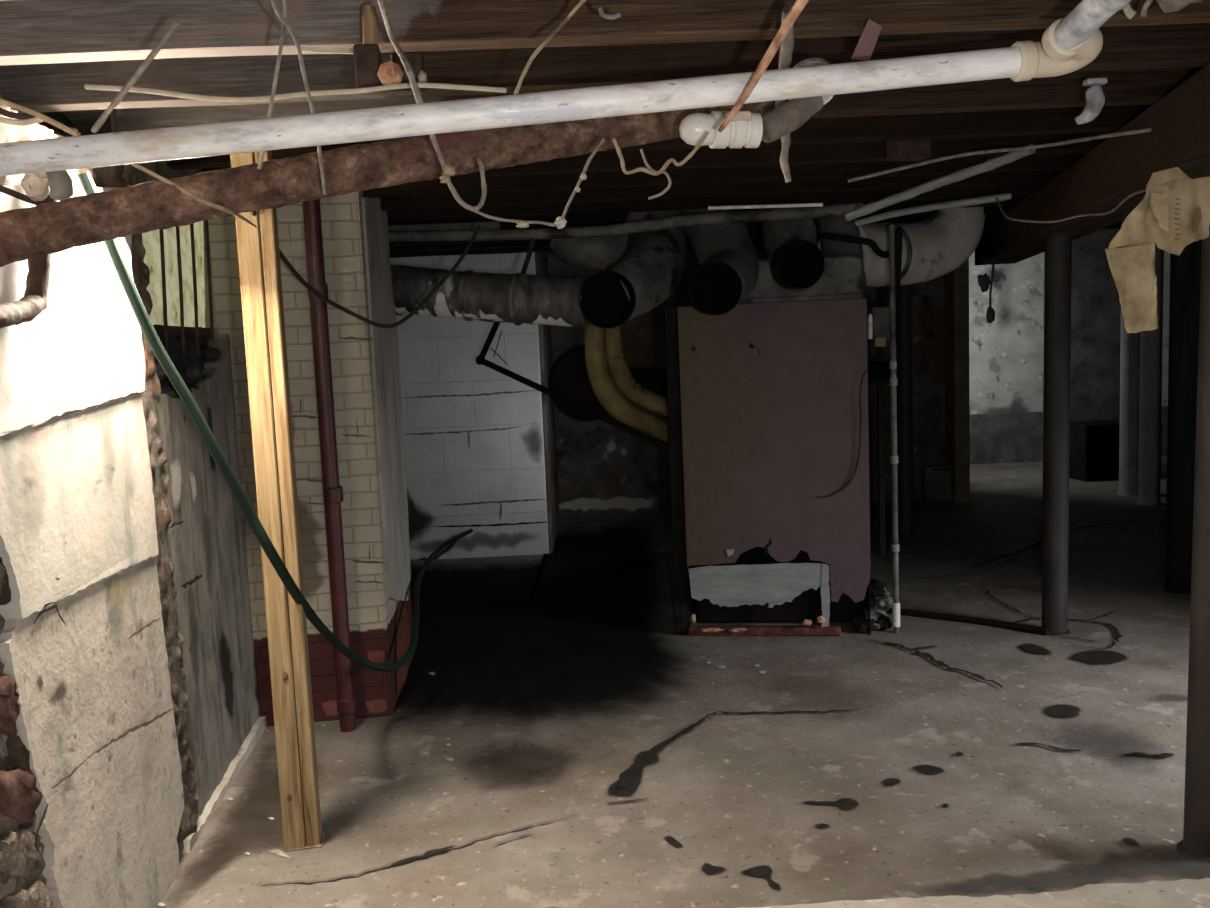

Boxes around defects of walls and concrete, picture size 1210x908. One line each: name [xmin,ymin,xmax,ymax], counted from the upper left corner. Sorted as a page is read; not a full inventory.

crack [0,392,143,440]
spalling [0,557,11,605]
crack [34,555,158,626]
crack [181,575,203,588]
crack [899,521,1166,649]
crack [873,640,1006,689]
spalling [37,677,66,703]
crack [664,709,860,745]
spalling [0,675,53,908]
crack [34,707,175,855]
damp [468,745,568,786]